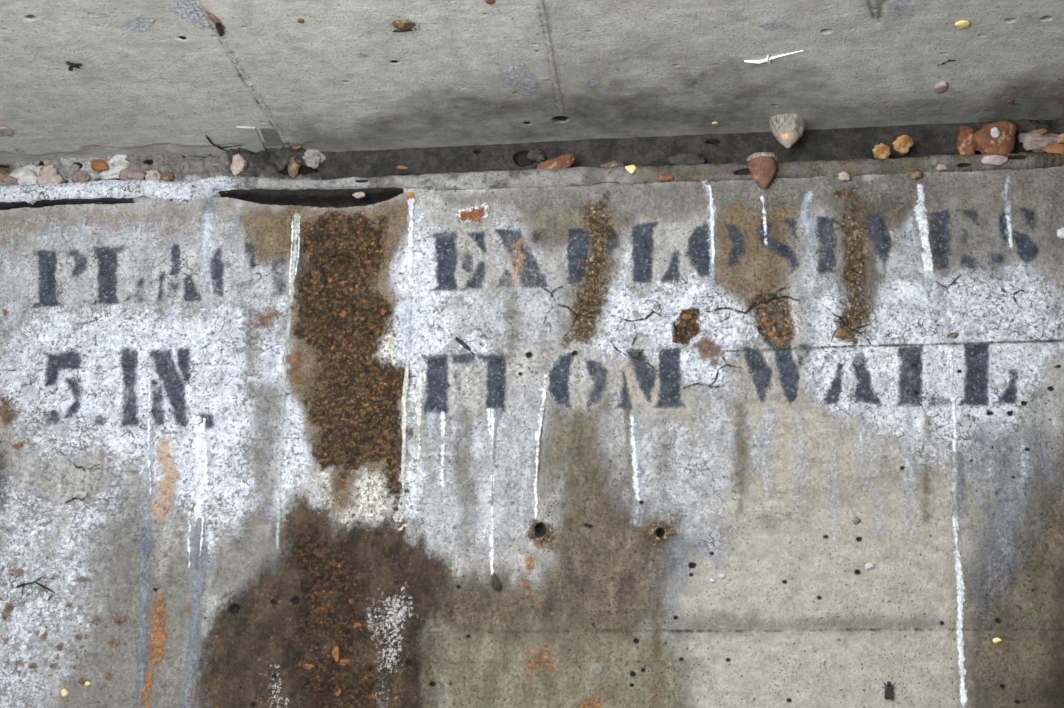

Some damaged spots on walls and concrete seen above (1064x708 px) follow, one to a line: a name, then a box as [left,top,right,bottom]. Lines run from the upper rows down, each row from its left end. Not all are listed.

rust [456,203,491,224]
crack [541,286,661,372]
crack [682,357,741,389]
rust [152,440,179,522]
damp [68,197,804,708]
damp [445,169,1064,708]
rust [141,595,170,708]